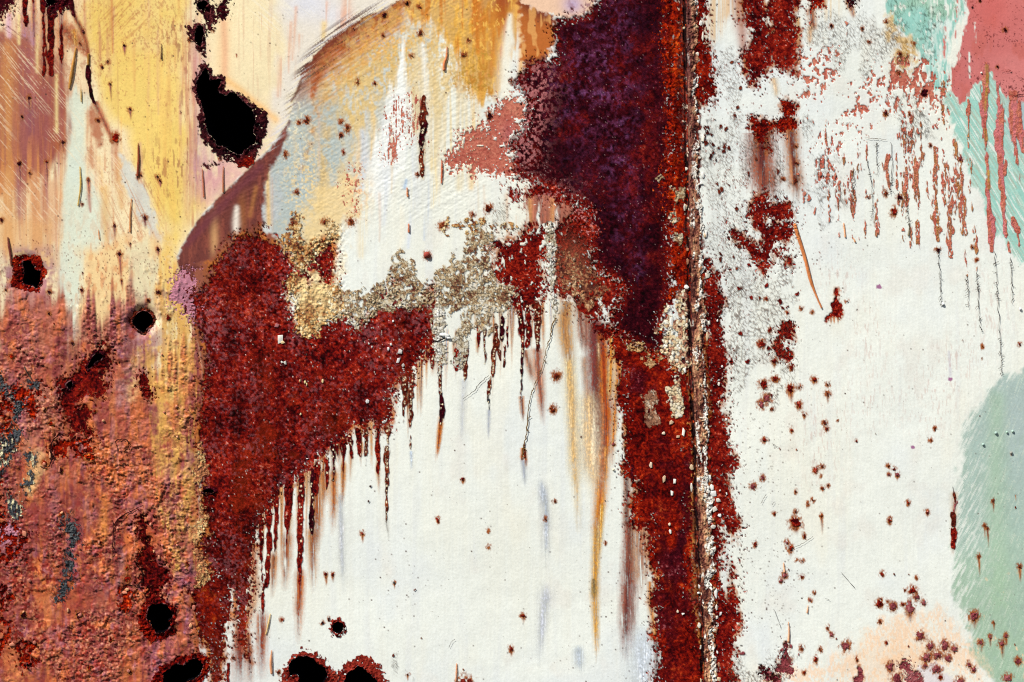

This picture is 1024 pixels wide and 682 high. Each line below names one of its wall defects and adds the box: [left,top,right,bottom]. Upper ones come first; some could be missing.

rust [724,0,827,281]
peeling [826,62,1024,277]
rust [0,333,120,475]
peeling [276,210,519,376]
rust [116,0,766,682]
rust [0,481,46,676]
rust [779,464,830,584]
rust [875,574,926,624]
rust [885,630,976,682]
rust [968,609,1022,682]